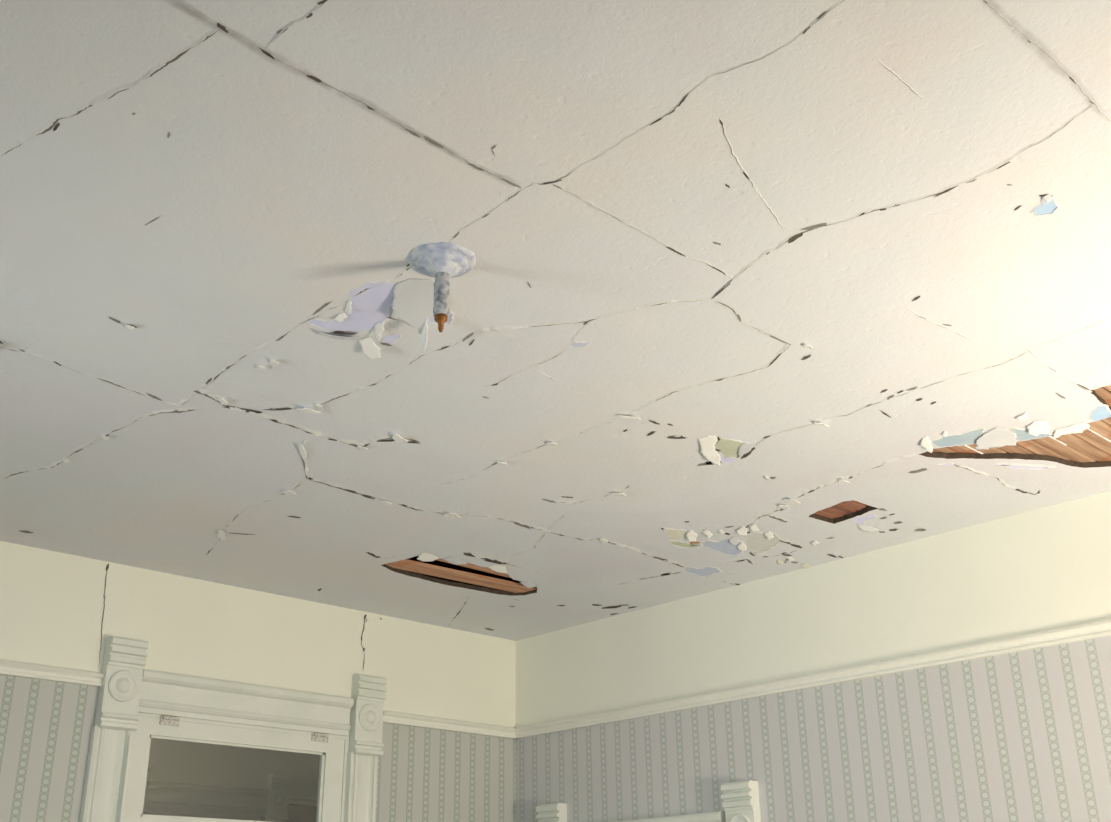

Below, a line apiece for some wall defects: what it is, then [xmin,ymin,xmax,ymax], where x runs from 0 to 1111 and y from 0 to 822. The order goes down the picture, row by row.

peeling [306,279,455,359]
crack [0,0,1111,585]
peeling [647,420,756,466]
flaking render [919,383,1111,469]
crack [98,563,109,670]
flaking render [382,553,537,607]
peeling [655,500,926,585]